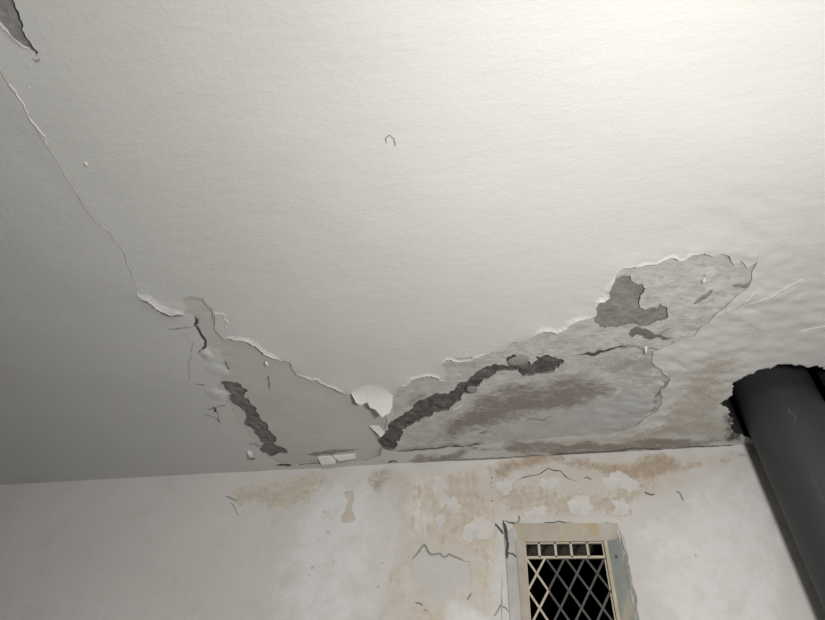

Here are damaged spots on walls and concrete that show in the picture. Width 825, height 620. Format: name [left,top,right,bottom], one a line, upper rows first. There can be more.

flaking render [0,0,40,62]
crack [0,69,138,289]
peeling [137,253,757,464]
water stain [446,376,609,435]
water stain [412,447,488,463]
crack [519,468,592,481]
water stain [495,439,713,513]
crack [494,516,520,620]